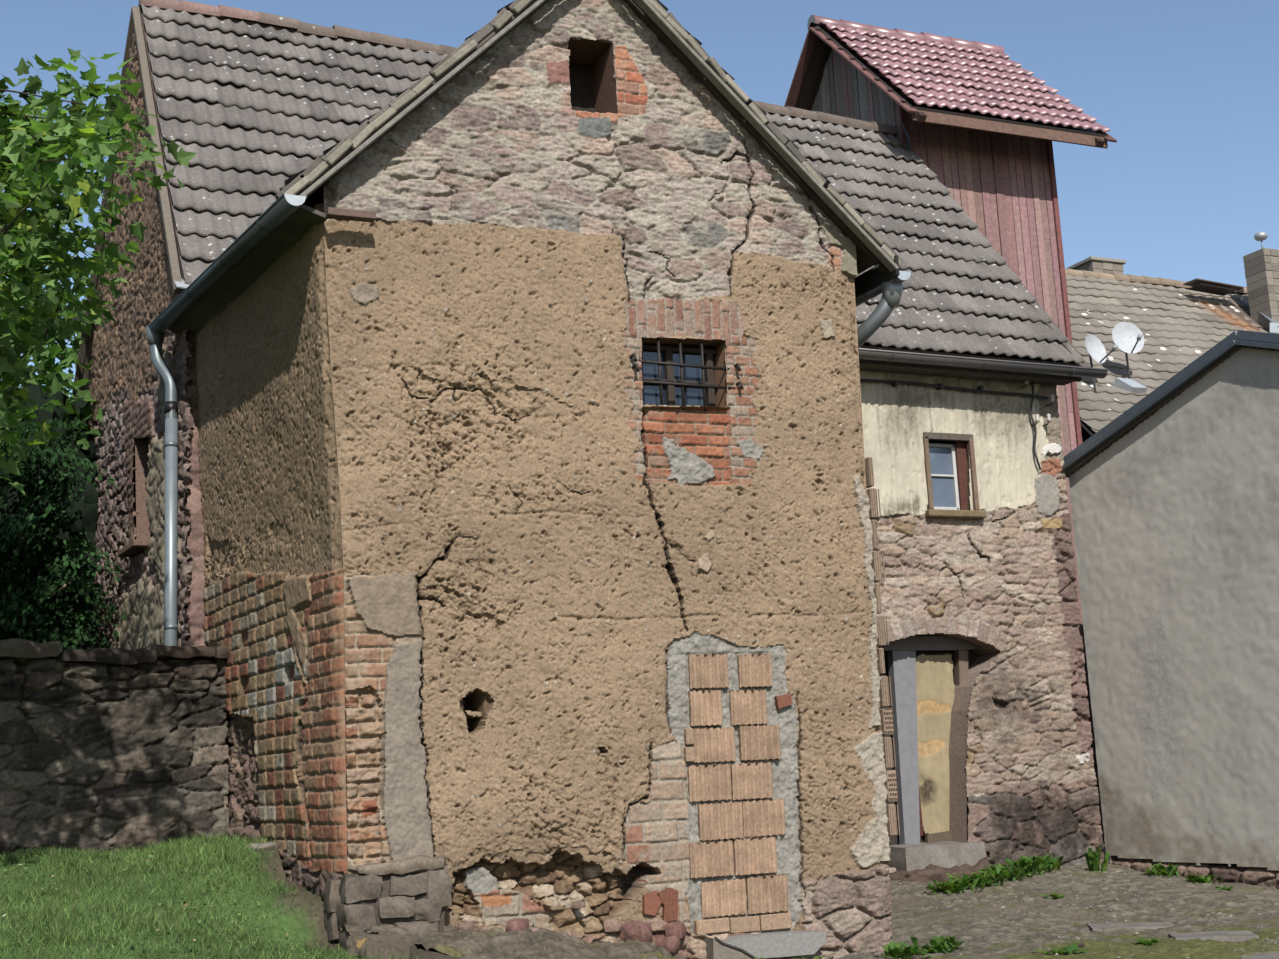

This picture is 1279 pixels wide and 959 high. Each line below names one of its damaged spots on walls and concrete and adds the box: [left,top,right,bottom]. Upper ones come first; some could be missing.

flaking render [351,283,379,305]
crack [622,237,677,302]
crack [709,141,757,297]
peeling [821,223,858,275]
peeling [345,573,506,865]
crack [415,534,478,857]
spalling [447,850,662,936]